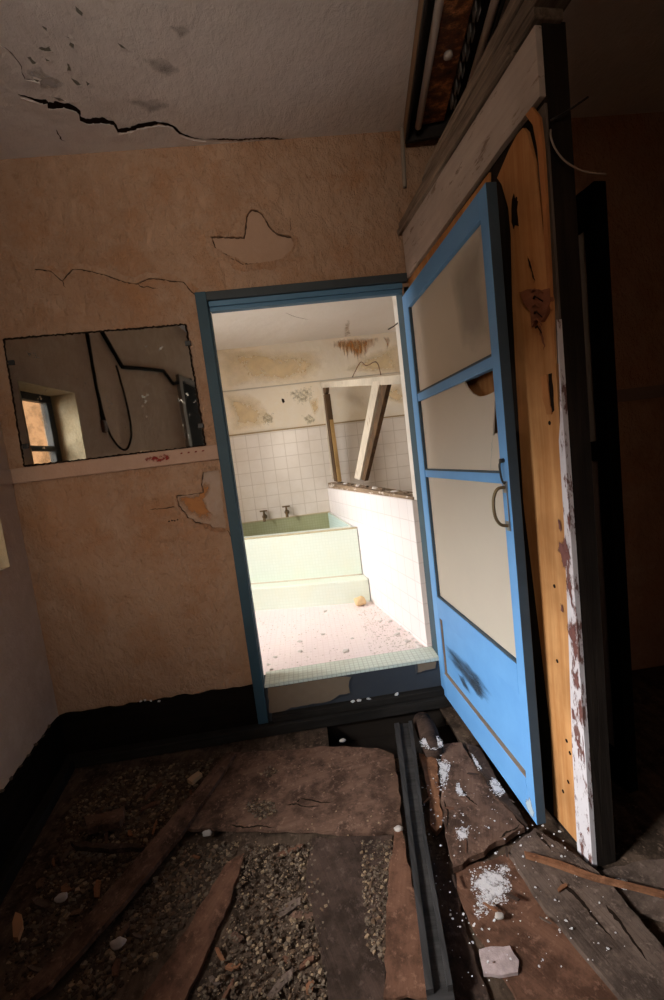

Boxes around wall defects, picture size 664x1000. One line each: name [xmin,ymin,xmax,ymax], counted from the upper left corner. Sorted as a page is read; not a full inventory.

crack [18,94,283,146]
crack [34,262,199,294]
spalling [151,465,231,537]
peeling [558,514,571,567]
peeling [567,624,580,690]